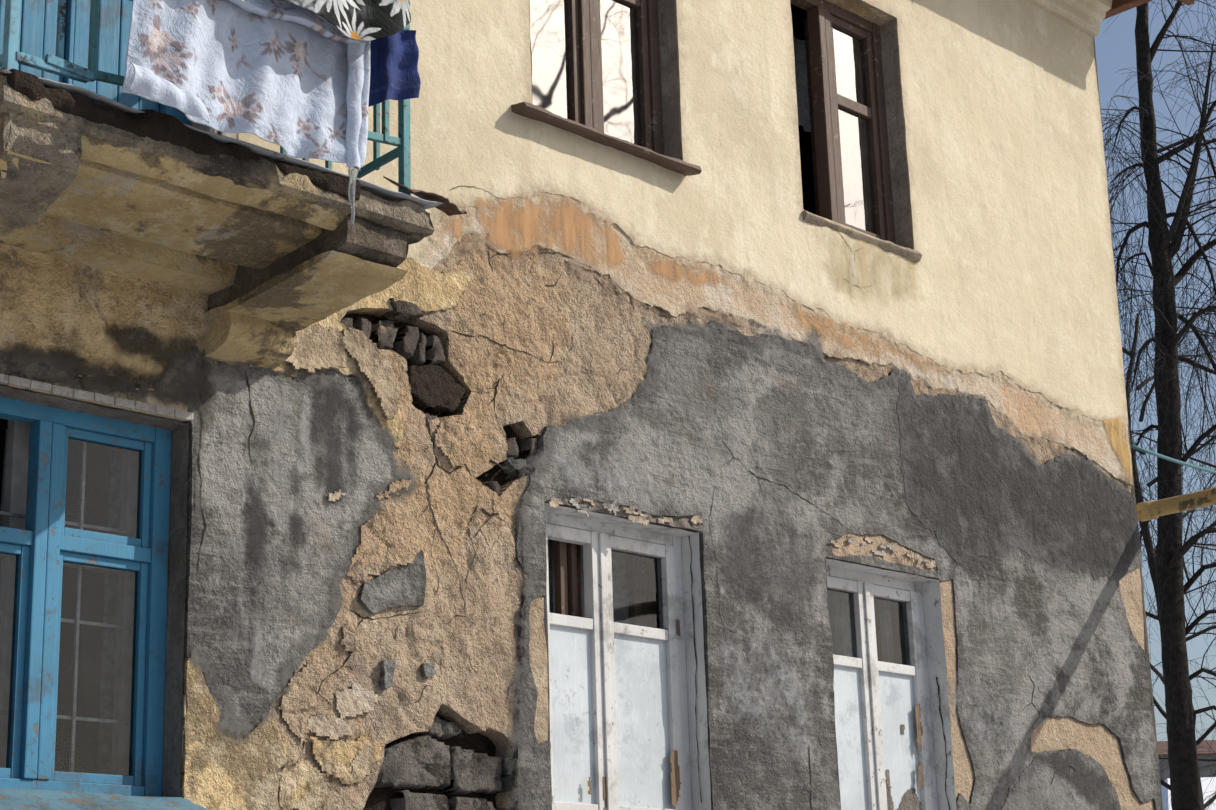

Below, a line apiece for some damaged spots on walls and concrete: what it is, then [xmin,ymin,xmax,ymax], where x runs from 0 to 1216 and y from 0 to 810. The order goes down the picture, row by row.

spalling [6,68,361,201]
crack [302,416,525,810]
flaking render [0,192,1133,810]
crack [688,433,847,803]
flaking render [1031,716,1154,810]
flaking render [1119,567,1146,653]